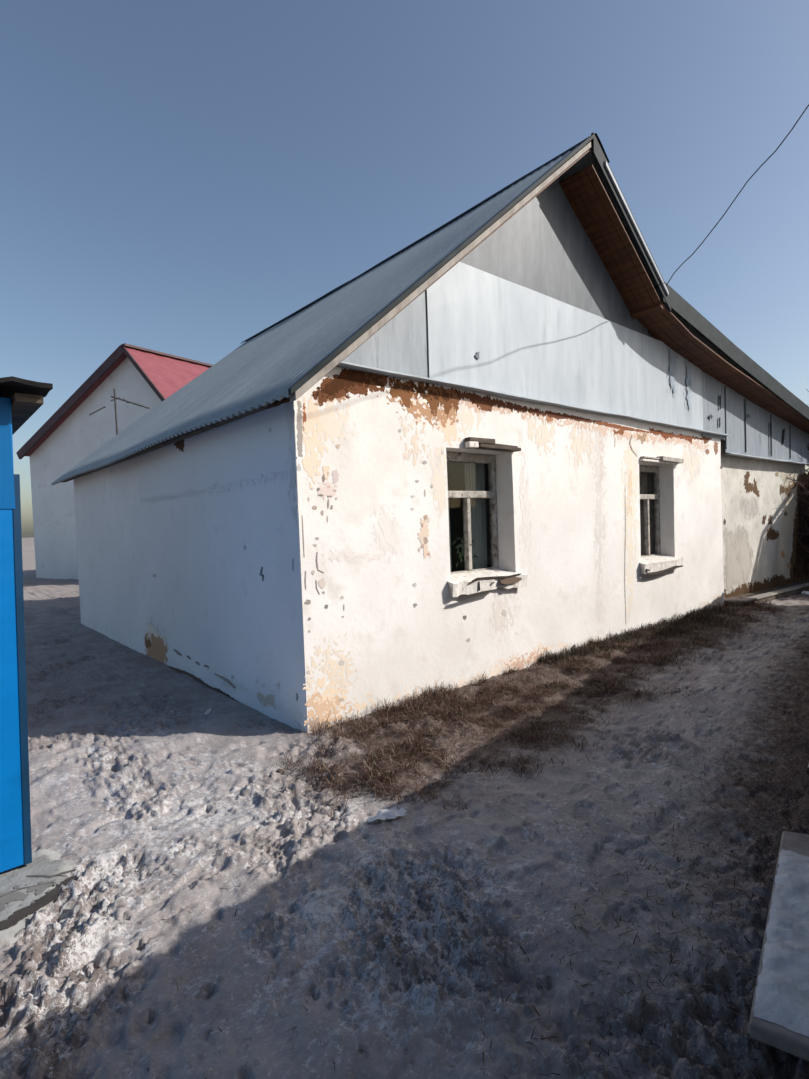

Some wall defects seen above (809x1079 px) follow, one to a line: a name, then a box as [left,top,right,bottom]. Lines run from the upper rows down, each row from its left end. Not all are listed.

flaking render [312,368,718,455]
peeling [308,466,339,523]
flaking render [724,471,809,598]
flaking render [144,633,234,679]